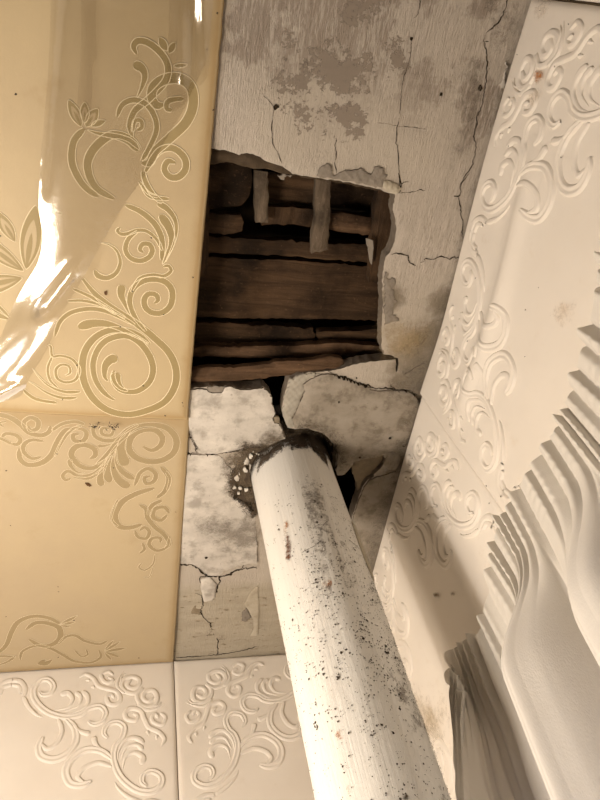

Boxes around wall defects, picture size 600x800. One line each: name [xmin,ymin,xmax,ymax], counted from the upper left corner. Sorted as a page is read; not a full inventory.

crack [391,0,508,266]
flaking render [317,163,401,194]
flaking render [207,384,226,393]
flaking render [273,372,320,428]
crack [328,339,425,400]
flaking render [233,451,261,495]
crack [179,564,259,658]
leakage [212,412,450,800]